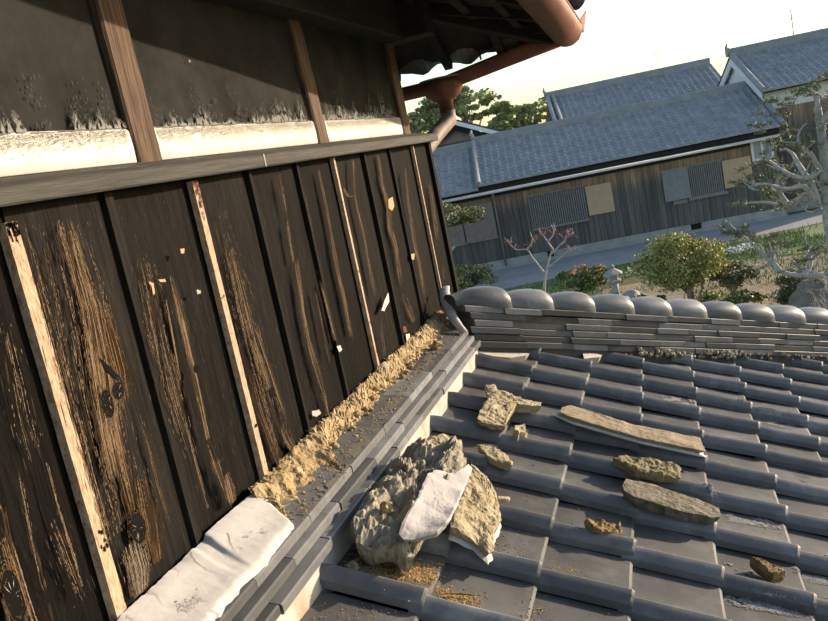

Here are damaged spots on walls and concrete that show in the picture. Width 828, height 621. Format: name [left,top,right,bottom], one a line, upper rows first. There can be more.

leakage [0,77,131,160]
leakage [150,85,316,147]
leakage [323,89,401,133]